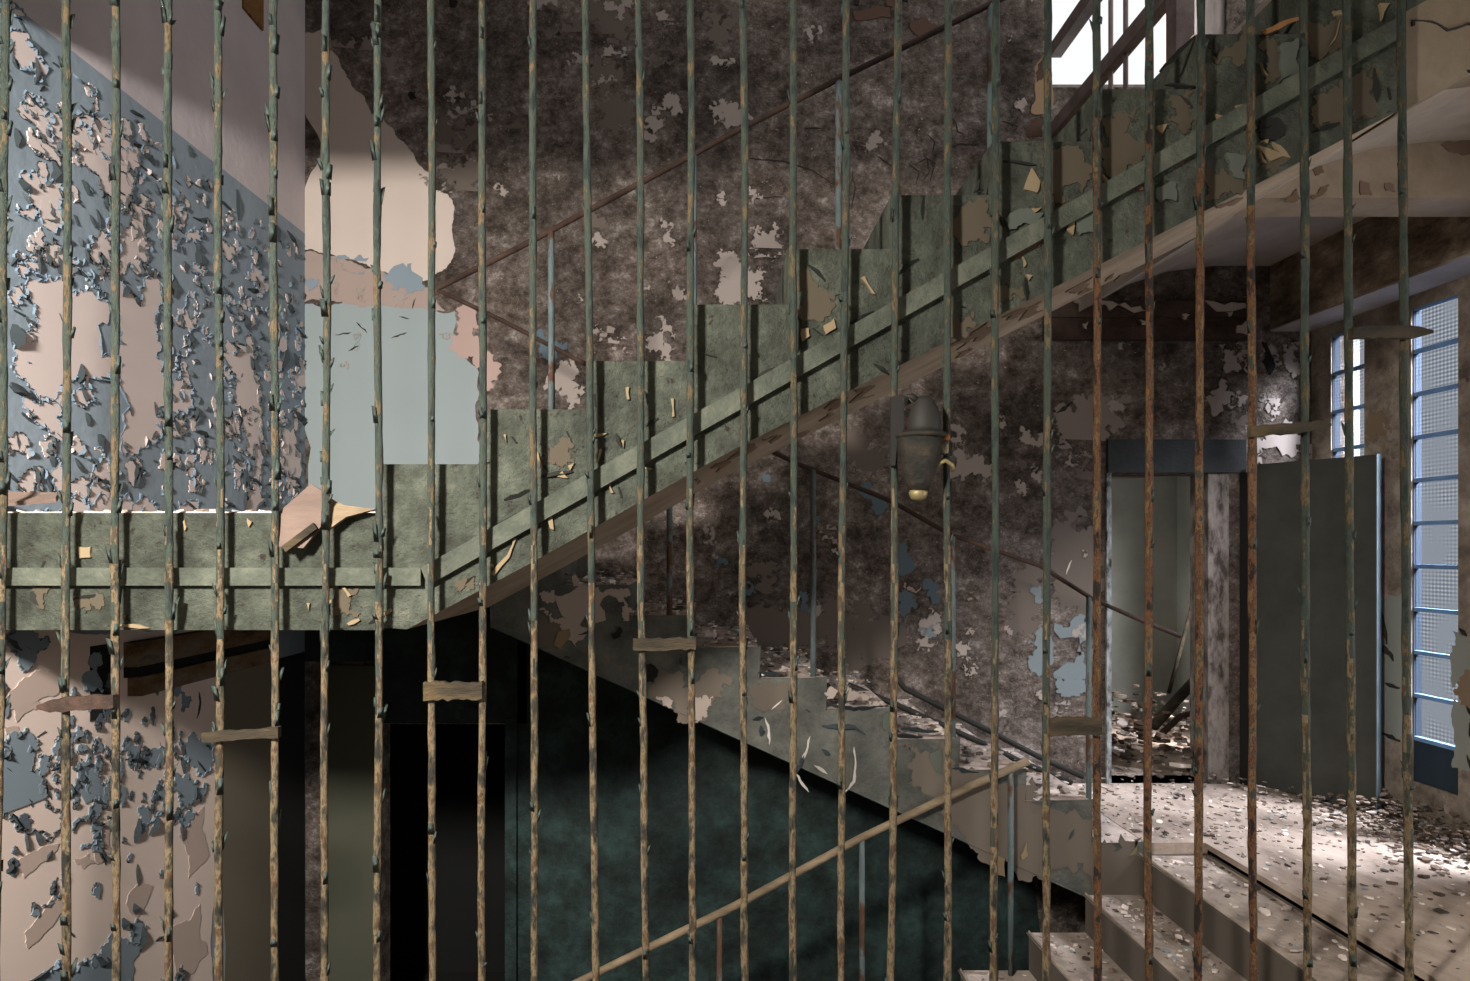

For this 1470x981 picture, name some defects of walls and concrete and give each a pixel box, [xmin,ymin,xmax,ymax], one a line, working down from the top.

crack [1412,20,1470,32]
peeling [1159,24,1299,125]
peeling [644,91,683,143]
peeling [708,98,754,130]
peeling [7,0,502,531]
peeling [713,222,786,305]
peeling [593,315,676,361]
peeling [543,355,585,409]
peeling [950,423,992,483]
spalling [538,575,633,649]
peeling [915,607,941,655]
peeling [0,614,216,981]